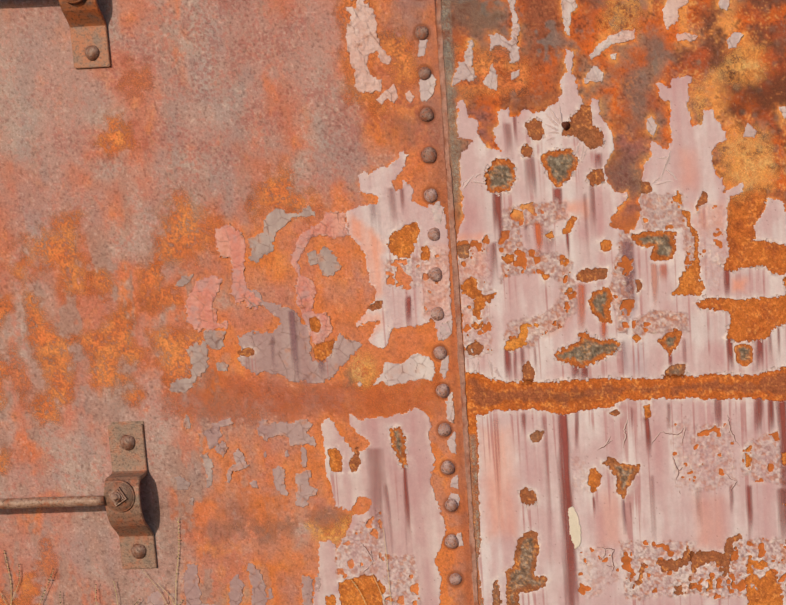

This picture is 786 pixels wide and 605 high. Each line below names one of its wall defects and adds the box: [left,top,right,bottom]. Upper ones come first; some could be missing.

peeling [345,0,436,105]
corrosion [707,47,762,83]
corrosion [95,118,134,155]
corrosion [545,102,570,141]
corrosion [246,170,314,220]
corrosion [14,211,113,295]
corrosion [138,194,221,313]
corrosion [0,293,210,424]
corrosion [289,312,297,357]
peeling [169,29,786,605]
corrosion [756,398,786,453]
corrosion [559,414,578,605]